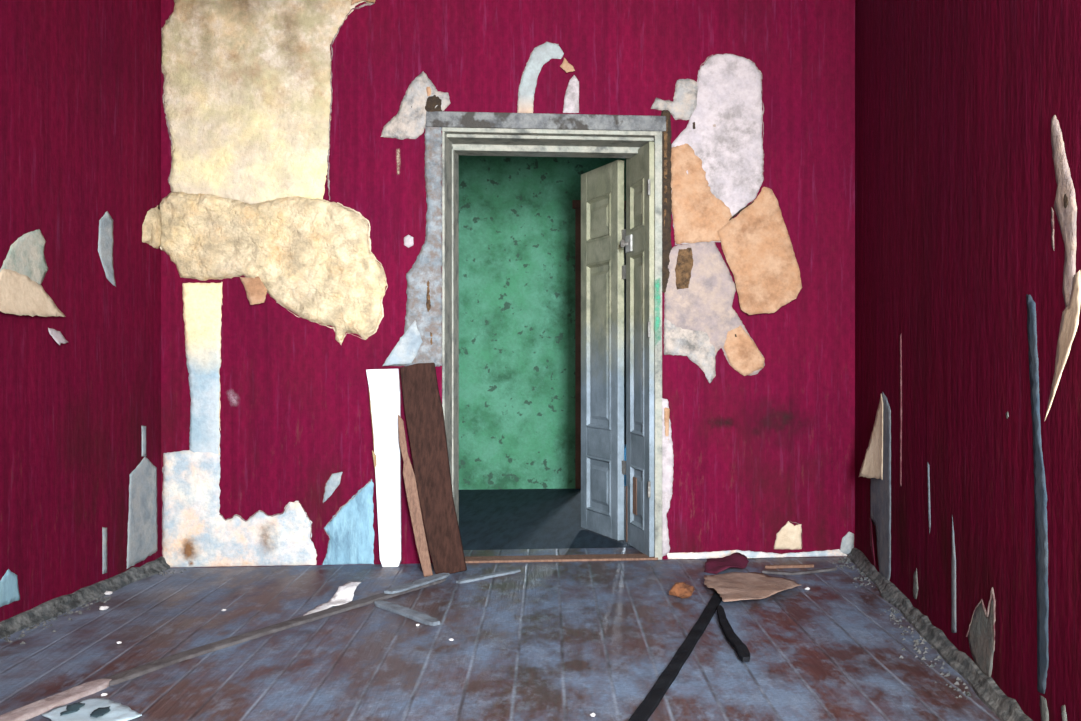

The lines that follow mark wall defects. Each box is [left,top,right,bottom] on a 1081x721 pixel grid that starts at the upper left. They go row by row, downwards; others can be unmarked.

peeling [560,58,575,73]
flaking render [381,71,450,367]
flaking render [651,79,765,383]
flaking render [162,450,317,567]